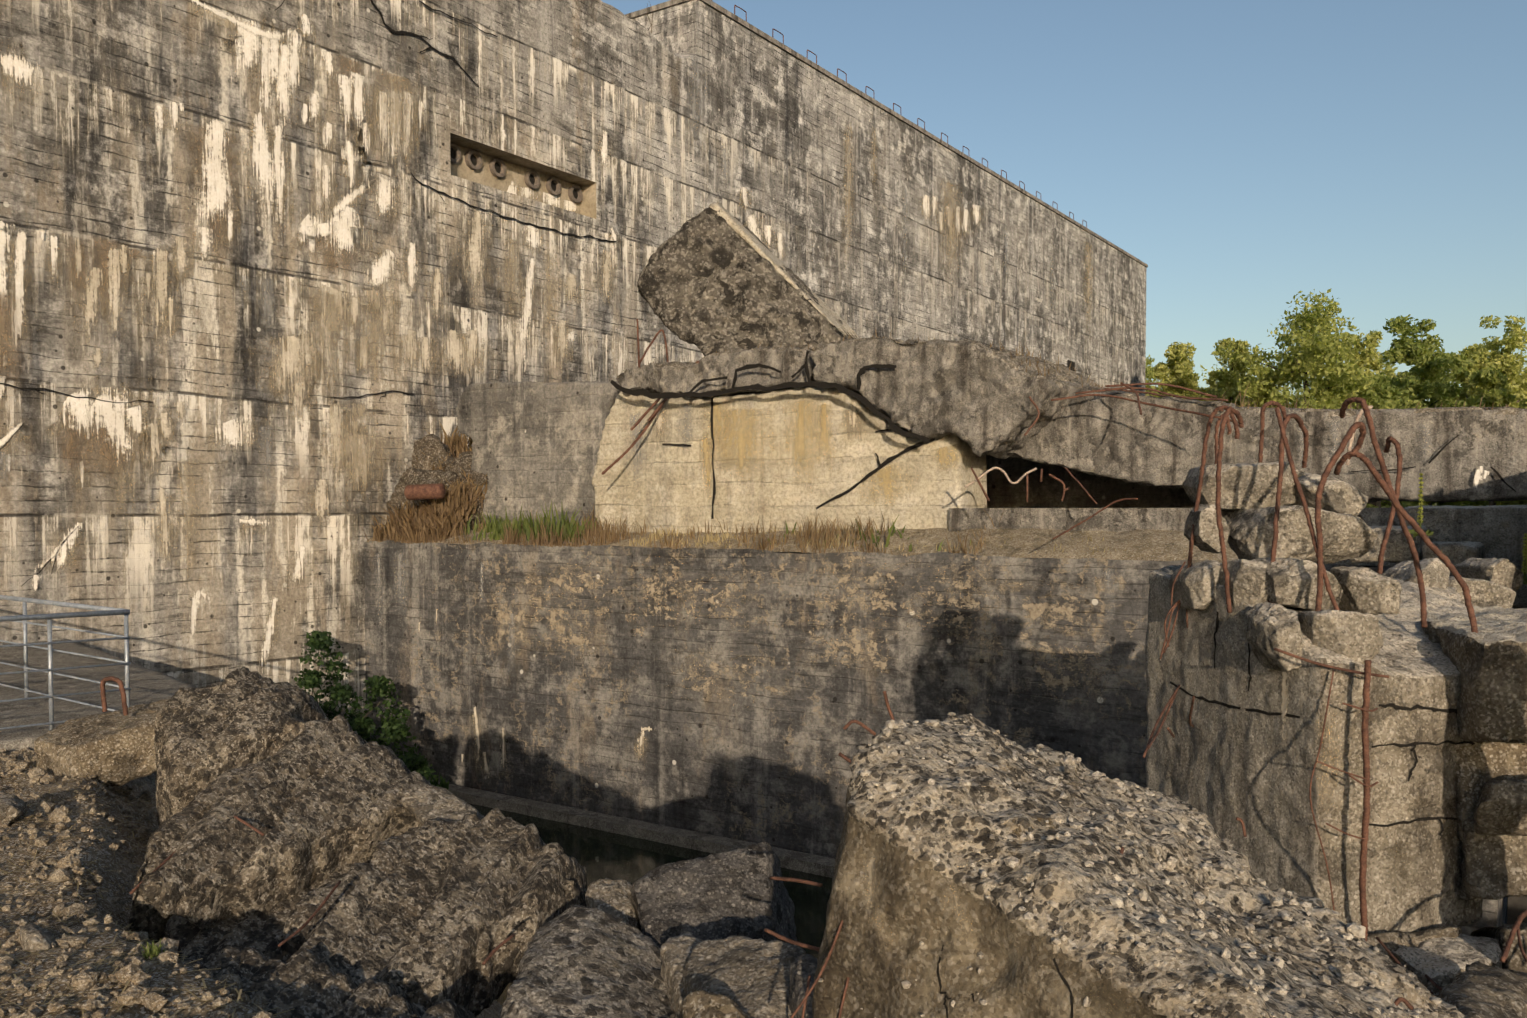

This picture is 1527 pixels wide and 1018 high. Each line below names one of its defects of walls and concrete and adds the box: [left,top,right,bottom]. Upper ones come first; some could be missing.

crack [370,0,498,86]
water stain [0,0,484,426]
water stain [600,227,617,302]
water stain [32,522,82,591]
water stain [48,386,214,635]
water stain [209,417,270,471]
water stain [239,518,270,530]
water stain [312,402,382,526]
crack [610,351,935,519]
crack [1348,435,1459,473]
crack [1490,467,1516,492]